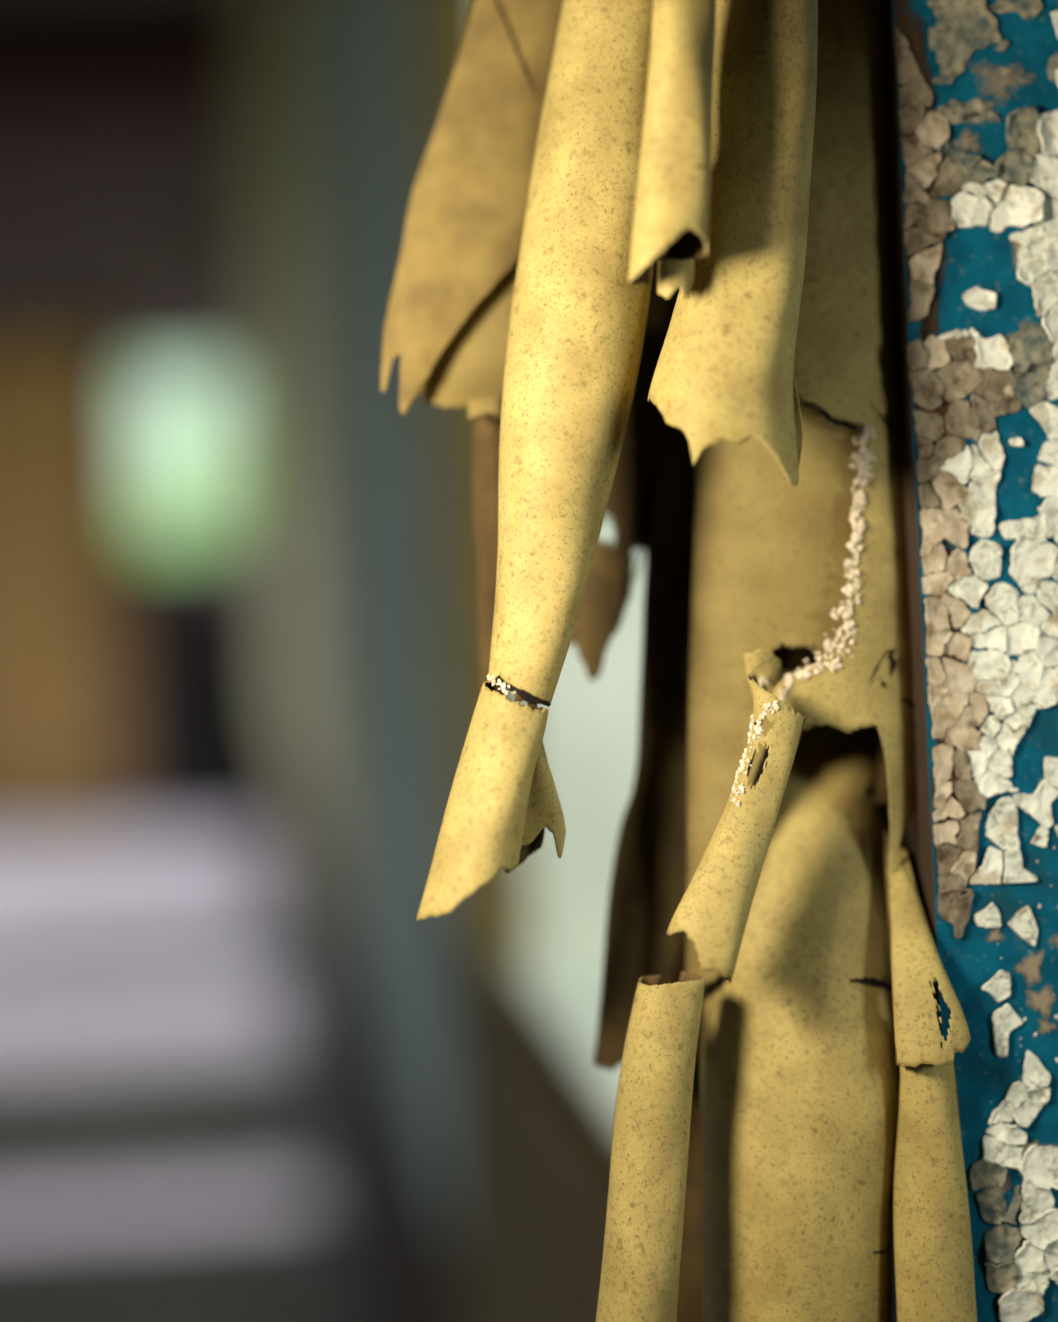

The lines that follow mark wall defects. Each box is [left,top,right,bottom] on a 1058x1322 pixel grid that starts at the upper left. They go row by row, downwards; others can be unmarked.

crack [496,682,551,707]
peeling [894,0,1058,1322]